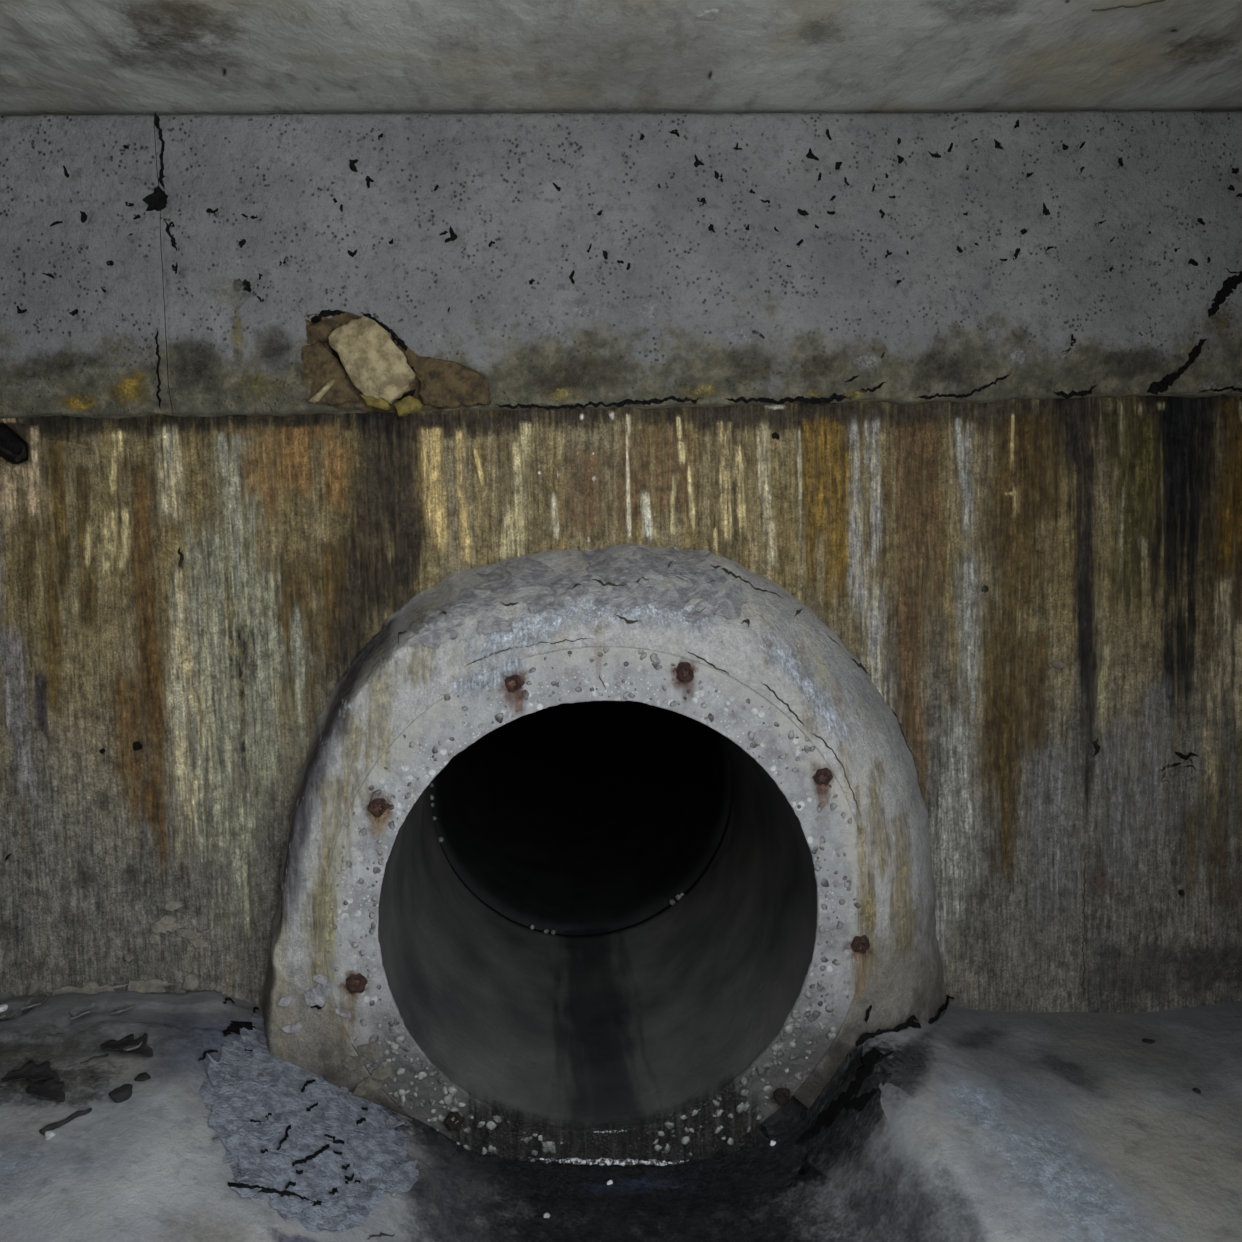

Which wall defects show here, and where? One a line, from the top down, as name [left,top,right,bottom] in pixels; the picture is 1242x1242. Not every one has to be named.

spalling [301,309,492,417]
crack [495,374,885,410]
crack [1147,268,1242,395]
water stain [0,379,1242,950]
spalling [574,647,718,722]
crack [761,682,861,816]
rust [857,764,912,964]
spalling [199,734,510,1233]
water stain [387,1033,929,1242]
spalling [653,836,865,1156]
crack [794,995,954,1144]
water stain [855,1170,976,1242]